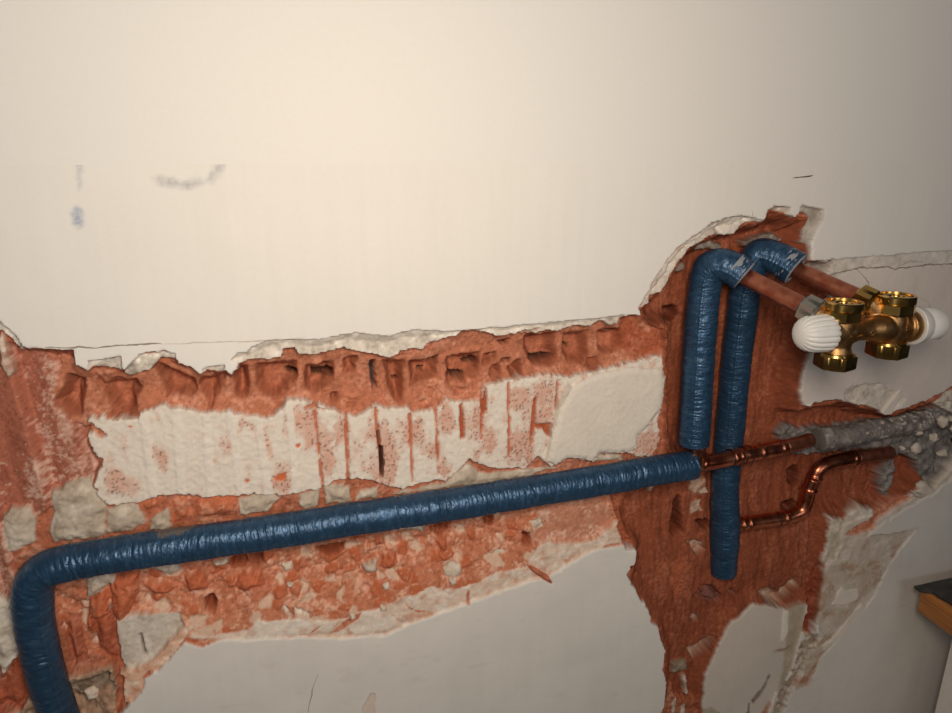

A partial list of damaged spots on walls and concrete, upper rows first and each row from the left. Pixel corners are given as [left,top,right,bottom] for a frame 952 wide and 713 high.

flaking render [799,250,952,415]
spalling [0,205,825,713]
flaking render [701,466,952,713]